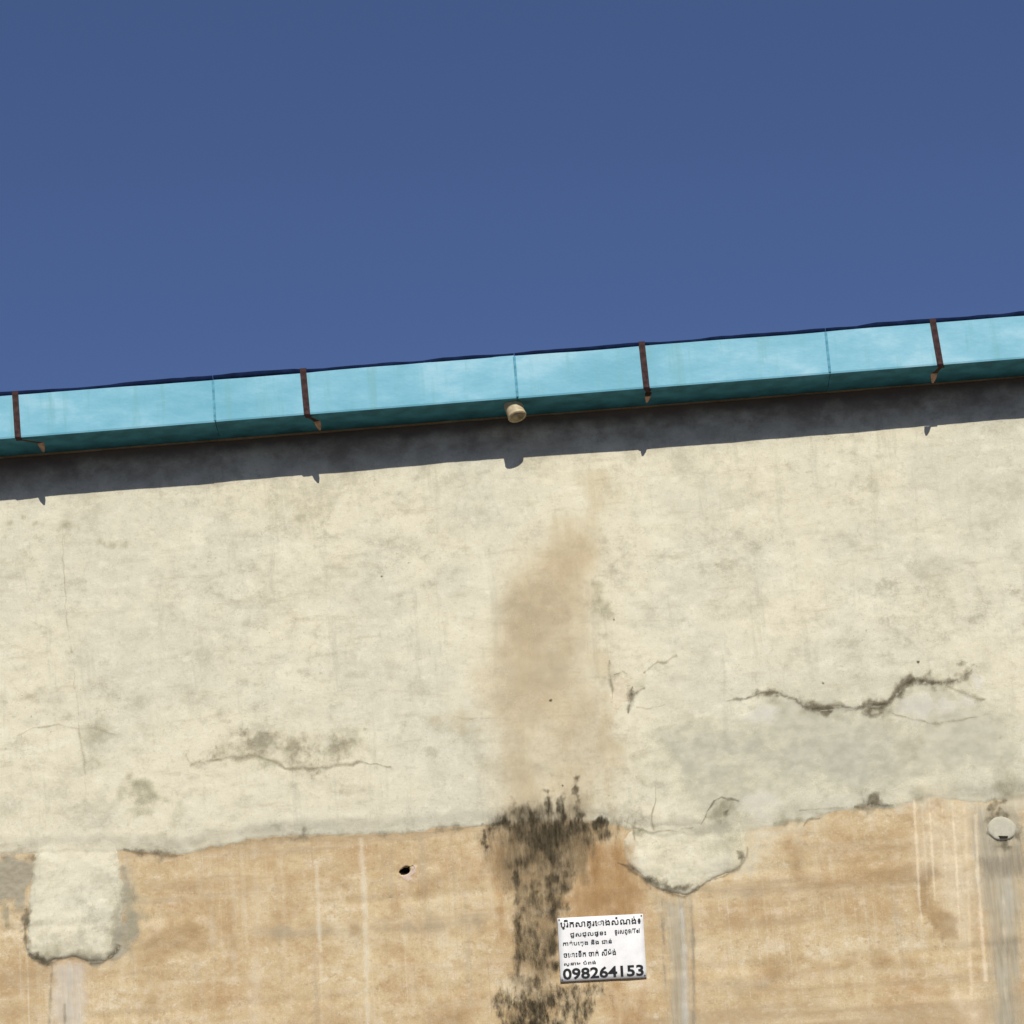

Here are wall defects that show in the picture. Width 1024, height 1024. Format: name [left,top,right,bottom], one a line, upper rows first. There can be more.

crack [747,674,968,716]
hole [399,865,416,881]
mould [483,796,611,1024]